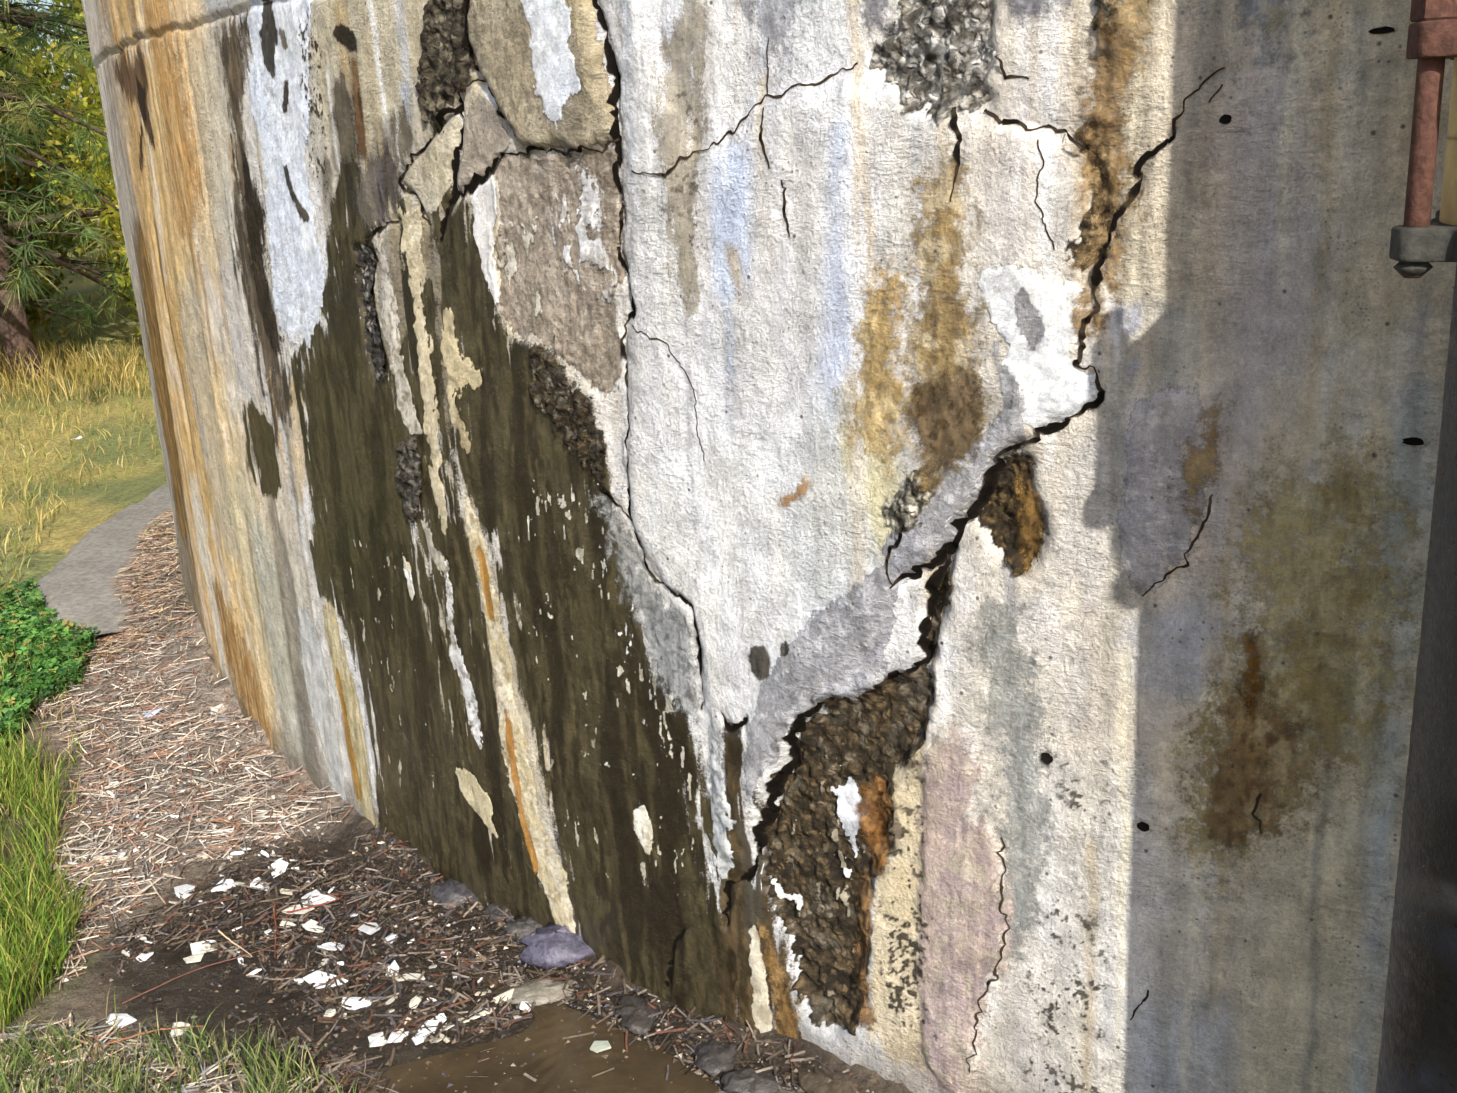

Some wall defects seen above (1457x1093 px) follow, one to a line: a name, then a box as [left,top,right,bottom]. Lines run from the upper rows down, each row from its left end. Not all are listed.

corrosion [333,23,367,158]
corrosion [1069,0,1154,343]
corrosion [137,225,189,553]
corrosion [295,600,378,828]
water stain [214,0,802,1038]
spalling [351,0,737,879]
crack [363,0,858,733]
crack [664,697,835,991]
spalling [742,123,1122,1093]
crack [876,55,1225,691]
peeling [368,1032,387,1047]
peeling [590,1041,611,1053]